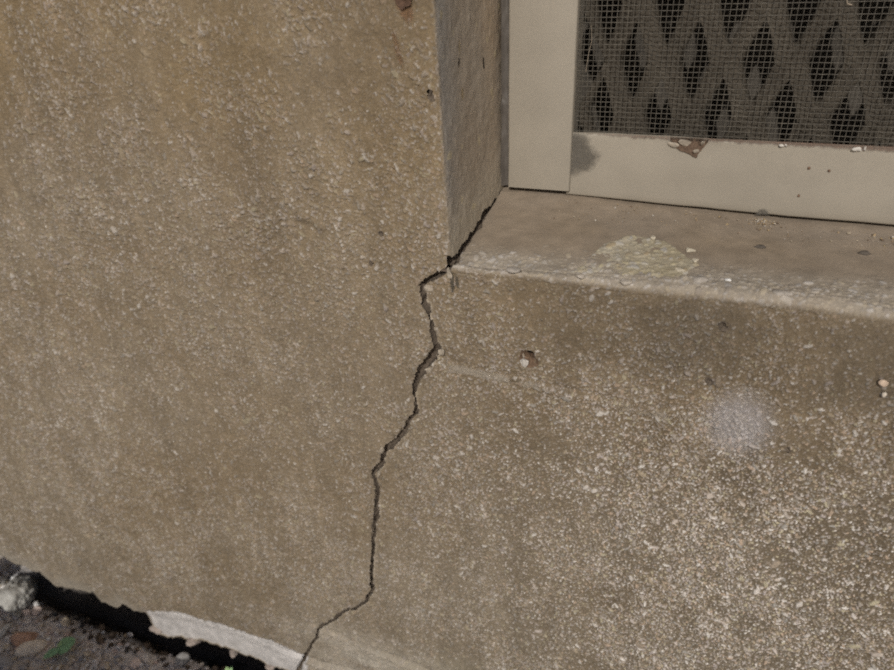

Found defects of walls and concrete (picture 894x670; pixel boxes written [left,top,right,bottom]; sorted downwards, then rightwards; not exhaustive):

peeling [668,137,708,158]
crack [296,198,497,670]